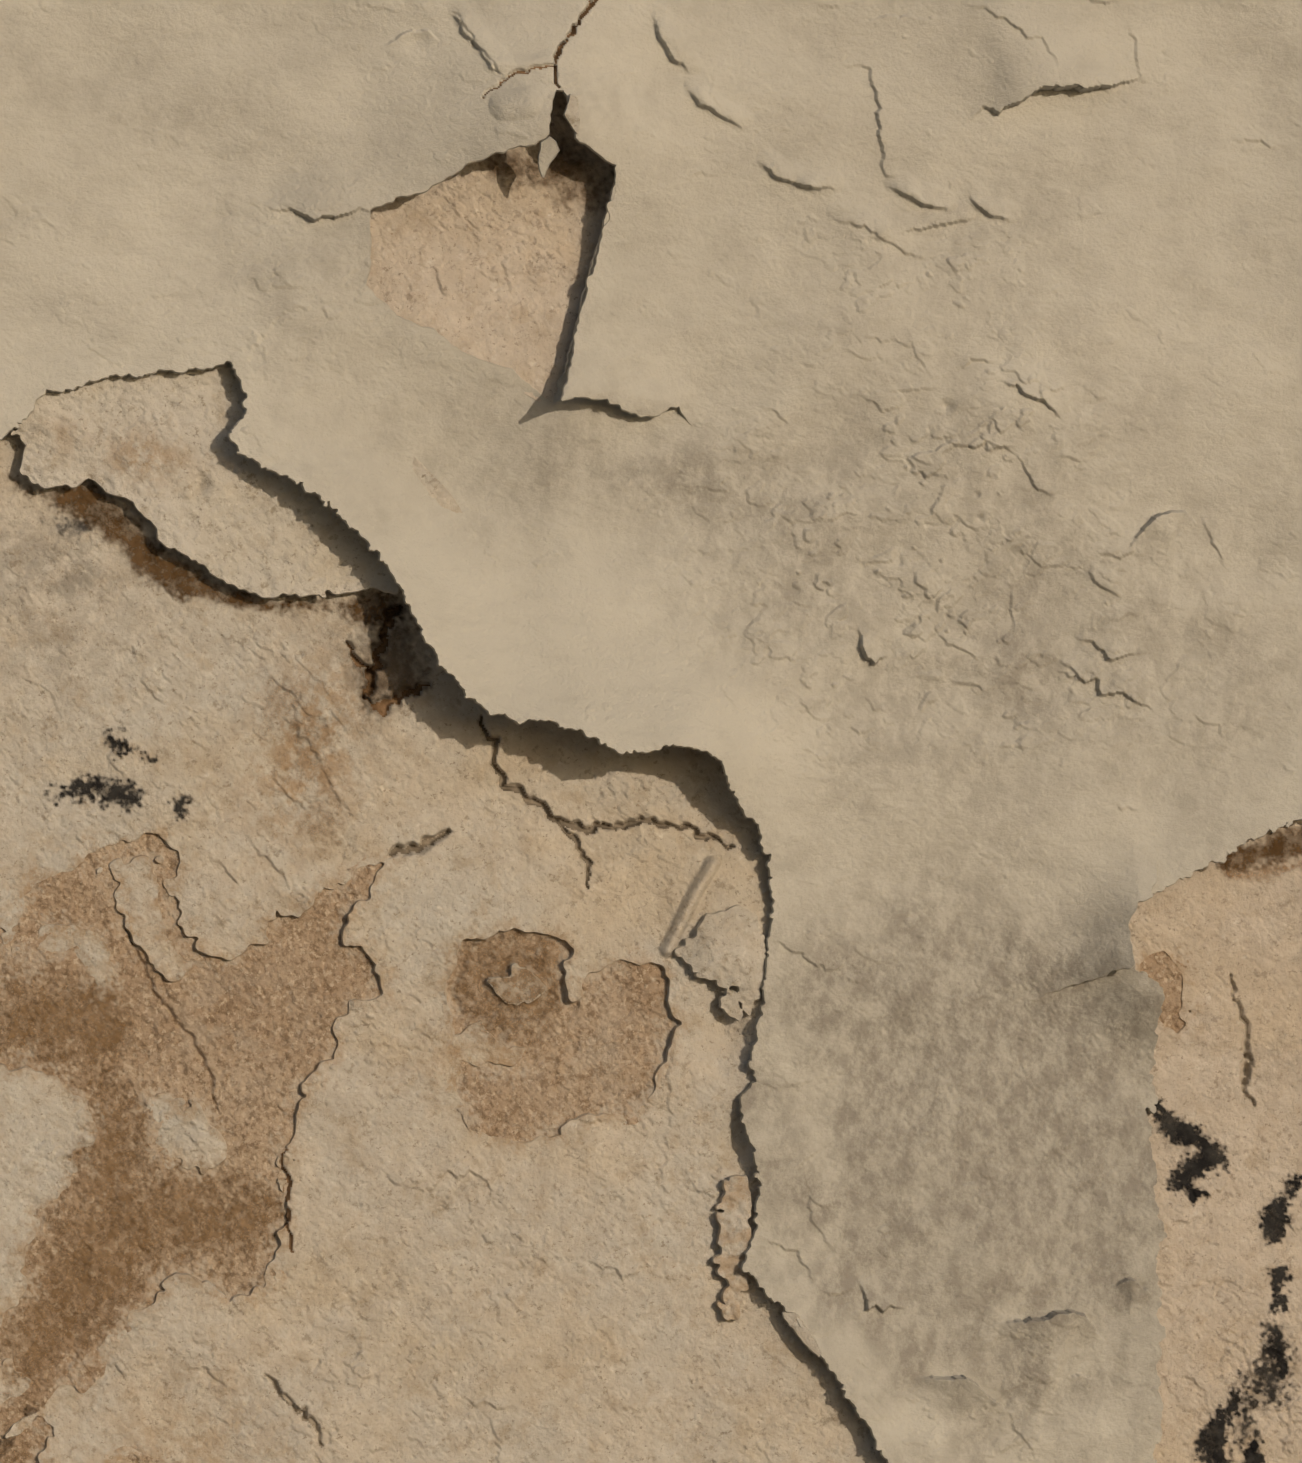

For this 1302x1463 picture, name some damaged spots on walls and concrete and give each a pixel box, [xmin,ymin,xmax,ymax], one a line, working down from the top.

crack [454,0,598,99]
peeling [236,54,754,439]
peeling [987,365,1079,429]
crack [389,831,451,857]
peeling [0,261,1060,1463]
crack [479,716,736,889]
peeling [954,763,1302,1463]
crack [264,1375,324,1448]
leakage [1231,1322,1300,1451]